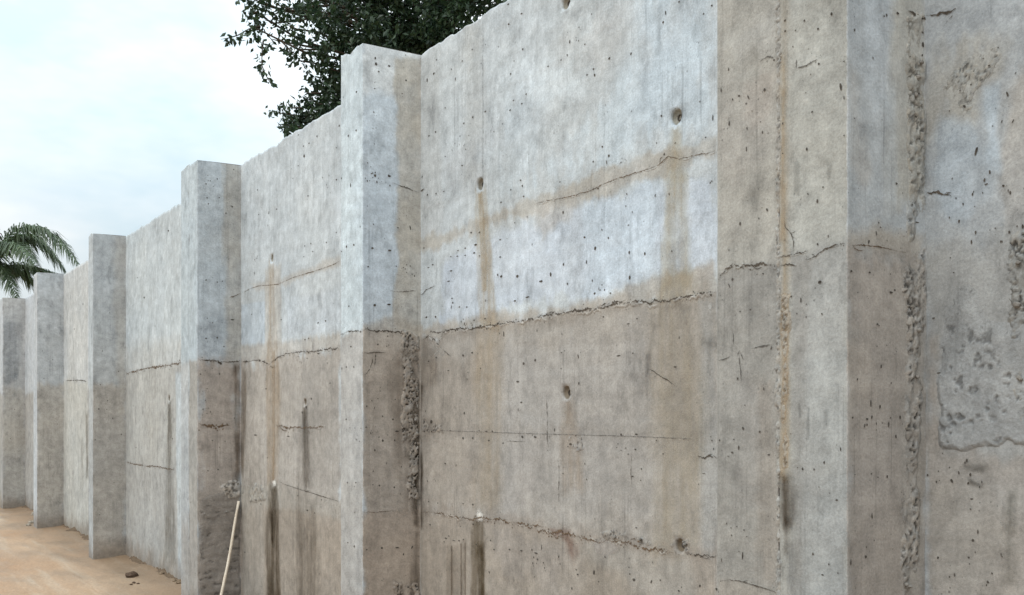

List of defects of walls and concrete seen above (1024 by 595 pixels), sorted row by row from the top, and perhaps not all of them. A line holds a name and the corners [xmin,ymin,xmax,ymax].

crack [536,152,714,205]
crack [127,218,906,375]
crack [369,511,776,593]